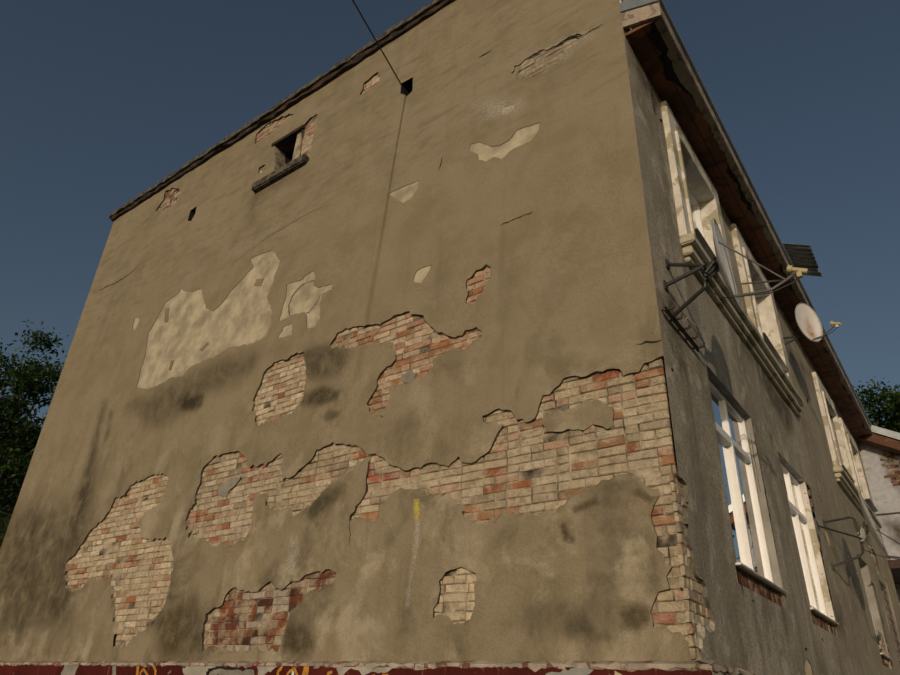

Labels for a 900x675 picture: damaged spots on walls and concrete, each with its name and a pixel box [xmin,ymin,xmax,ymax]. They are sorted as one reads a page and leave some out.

spalling [512,34,583,79]
spalling [255,113,293,144]
spalling [292,114,317,160]
spalling [466,264,491,305]
spalling [329,311,482,418]
spalling [65,473,173,650]
spalling [185,352,715,659]
spalling [804,484,838,632]
spalling [183,569,336,675]